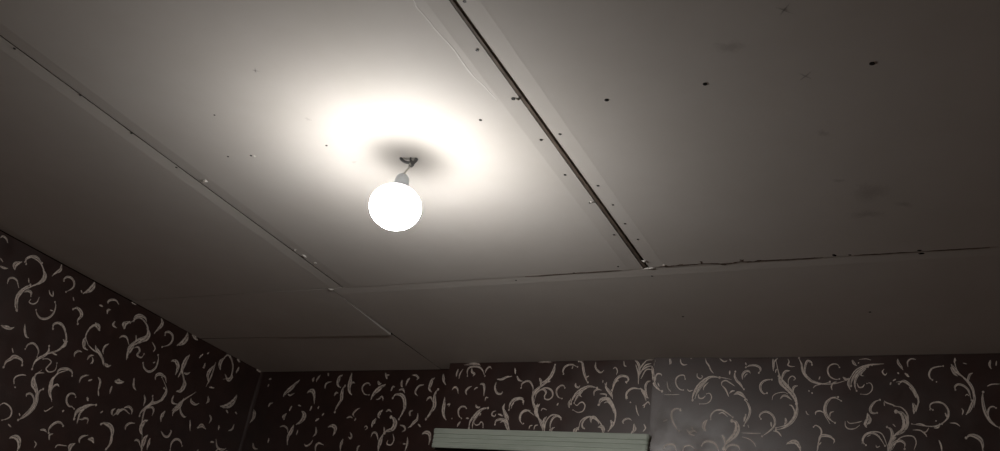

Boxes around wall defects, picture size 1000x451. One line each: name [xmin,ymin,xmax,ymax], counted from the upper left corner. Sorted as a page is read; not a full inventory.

crack [854,247,990,256]
crack [659,257,823,267]